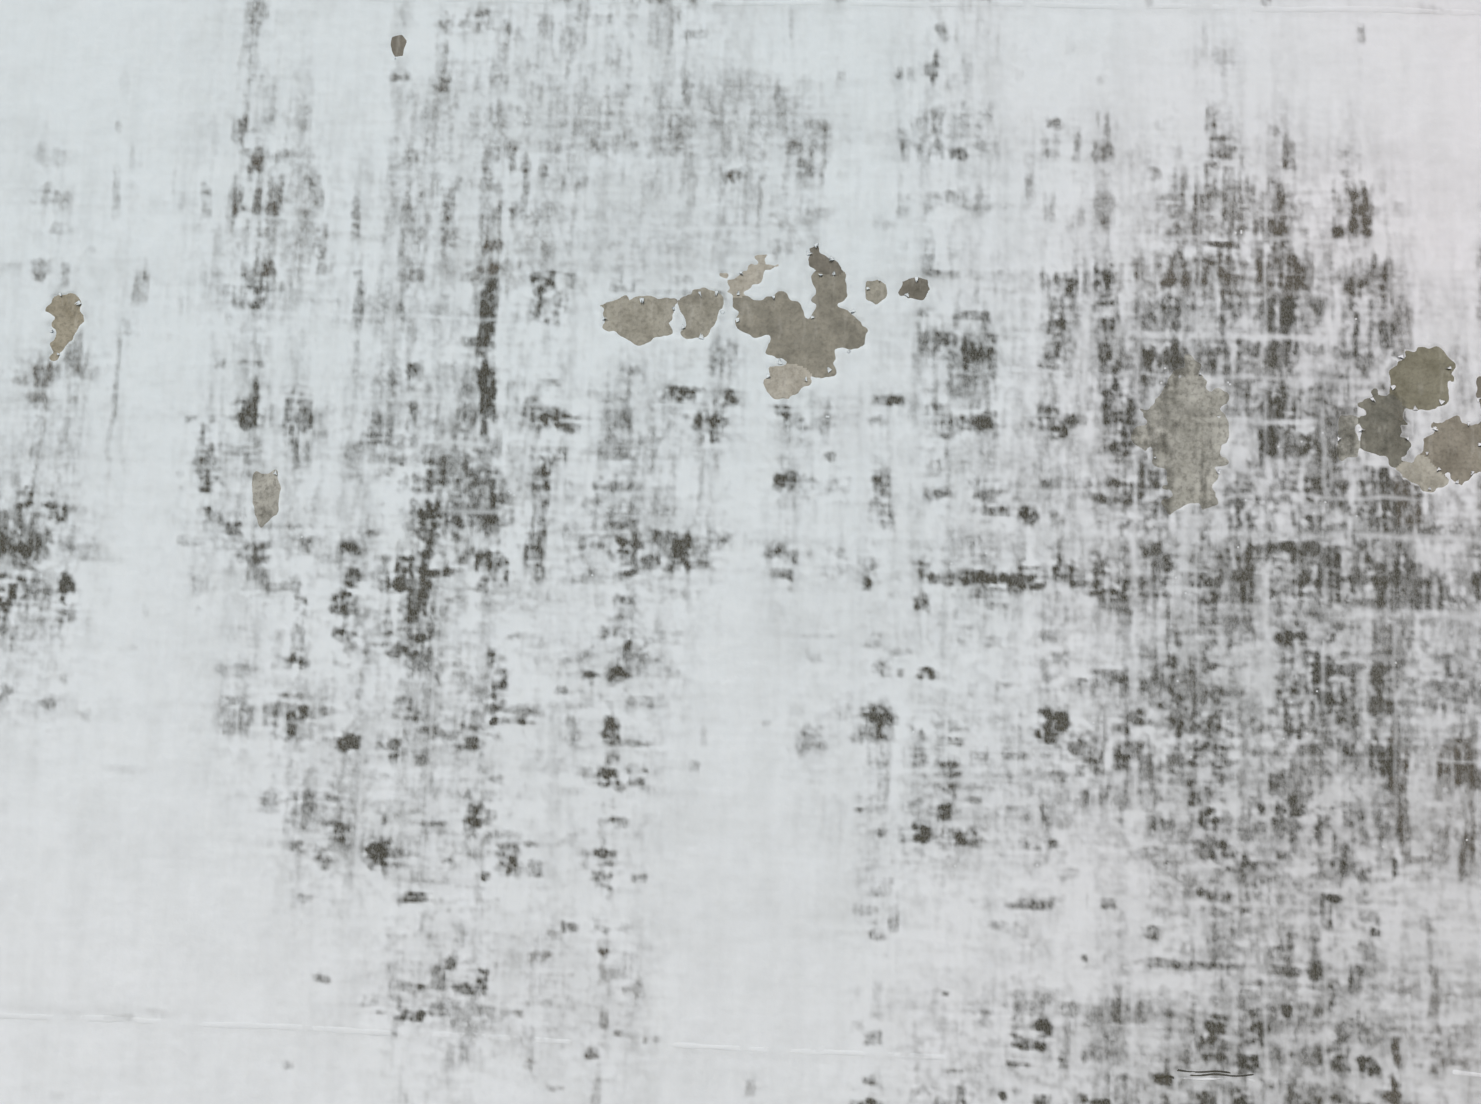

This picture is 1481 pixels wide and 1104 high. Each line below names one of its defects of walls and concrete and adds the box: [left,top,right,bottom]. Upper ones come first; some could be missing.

peeling [391,35,407,59]
peeling [45,292,84,361]
peeling [600,243,930,399]
mould [0,491,75,633]
peeling [252,470,281,528]
leakage [385,240,566,669]
mould [581,520,707,577]
peeling [1131,354,1229,515]
leakage [912,123,1481,913]
peeling [1337,346,1481,492]
leakage [330,821,402,867]
leakage [1153,933,1402,1104]